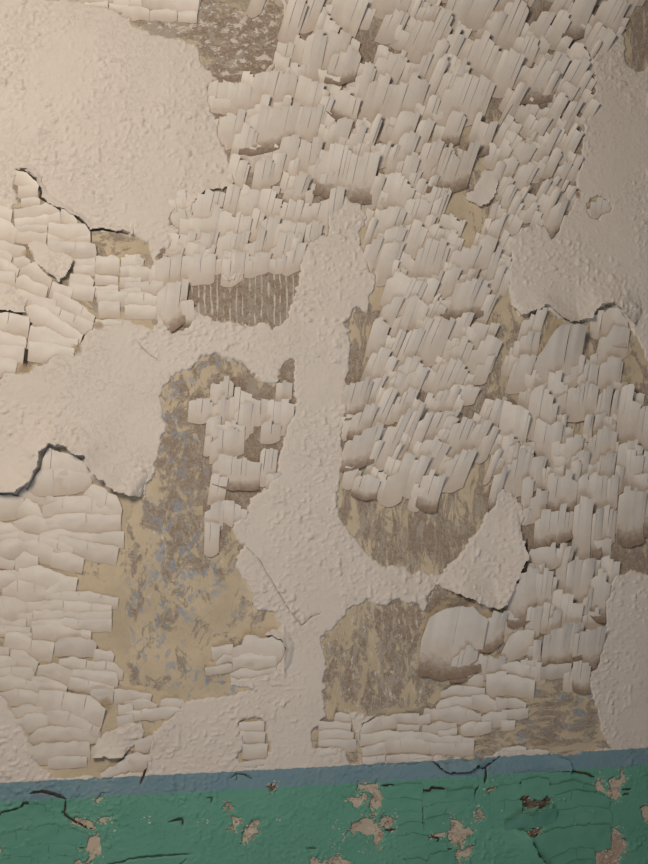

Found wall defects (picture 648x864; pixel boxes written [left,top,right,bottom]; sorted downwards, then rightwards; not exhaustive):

peeling [0,0,345,379]
peeling [272,0,648,864]
crack [0,790,96,830]
peeling [70,793,115,864]
crack [108,853,189,864]
peeling [222,798,264,846]
crack [422,761,452,850]
crack [474,756,499,793]